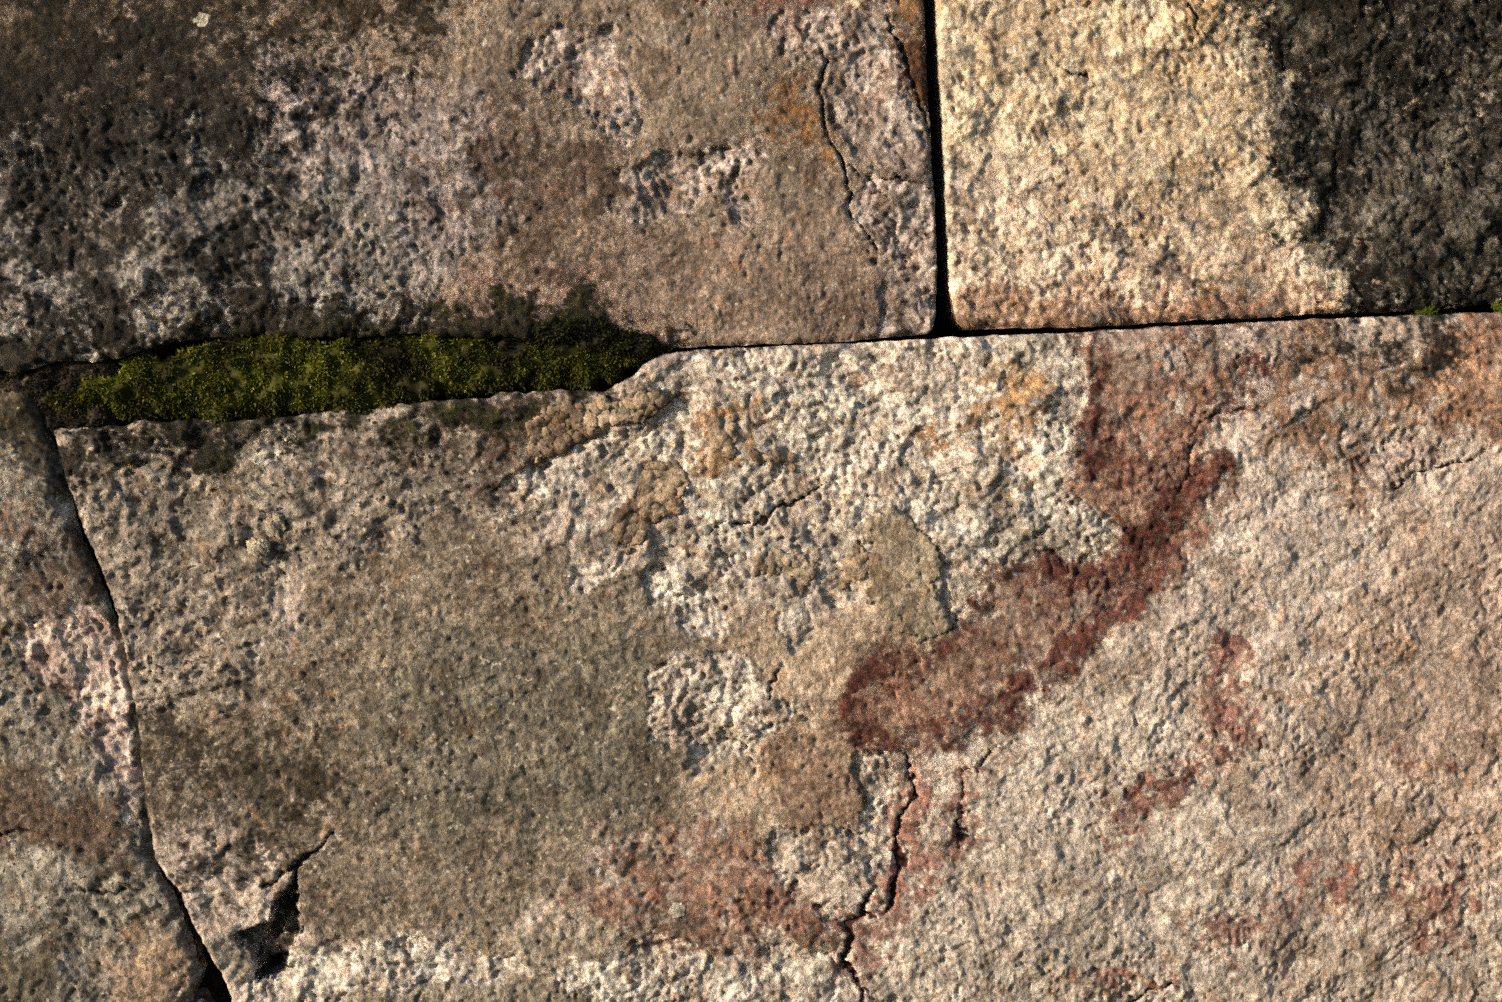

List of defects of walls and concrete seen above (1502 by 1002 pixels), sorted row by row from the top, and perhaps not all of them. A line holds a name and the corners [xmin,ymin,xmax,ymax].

damp [0,0,456,204]
crack [817,62,887,250]
damp [1224,0,1502,313]
crack [262,832,334,888]
crack [841,754,919,1002]
crack [955,746,997,849]